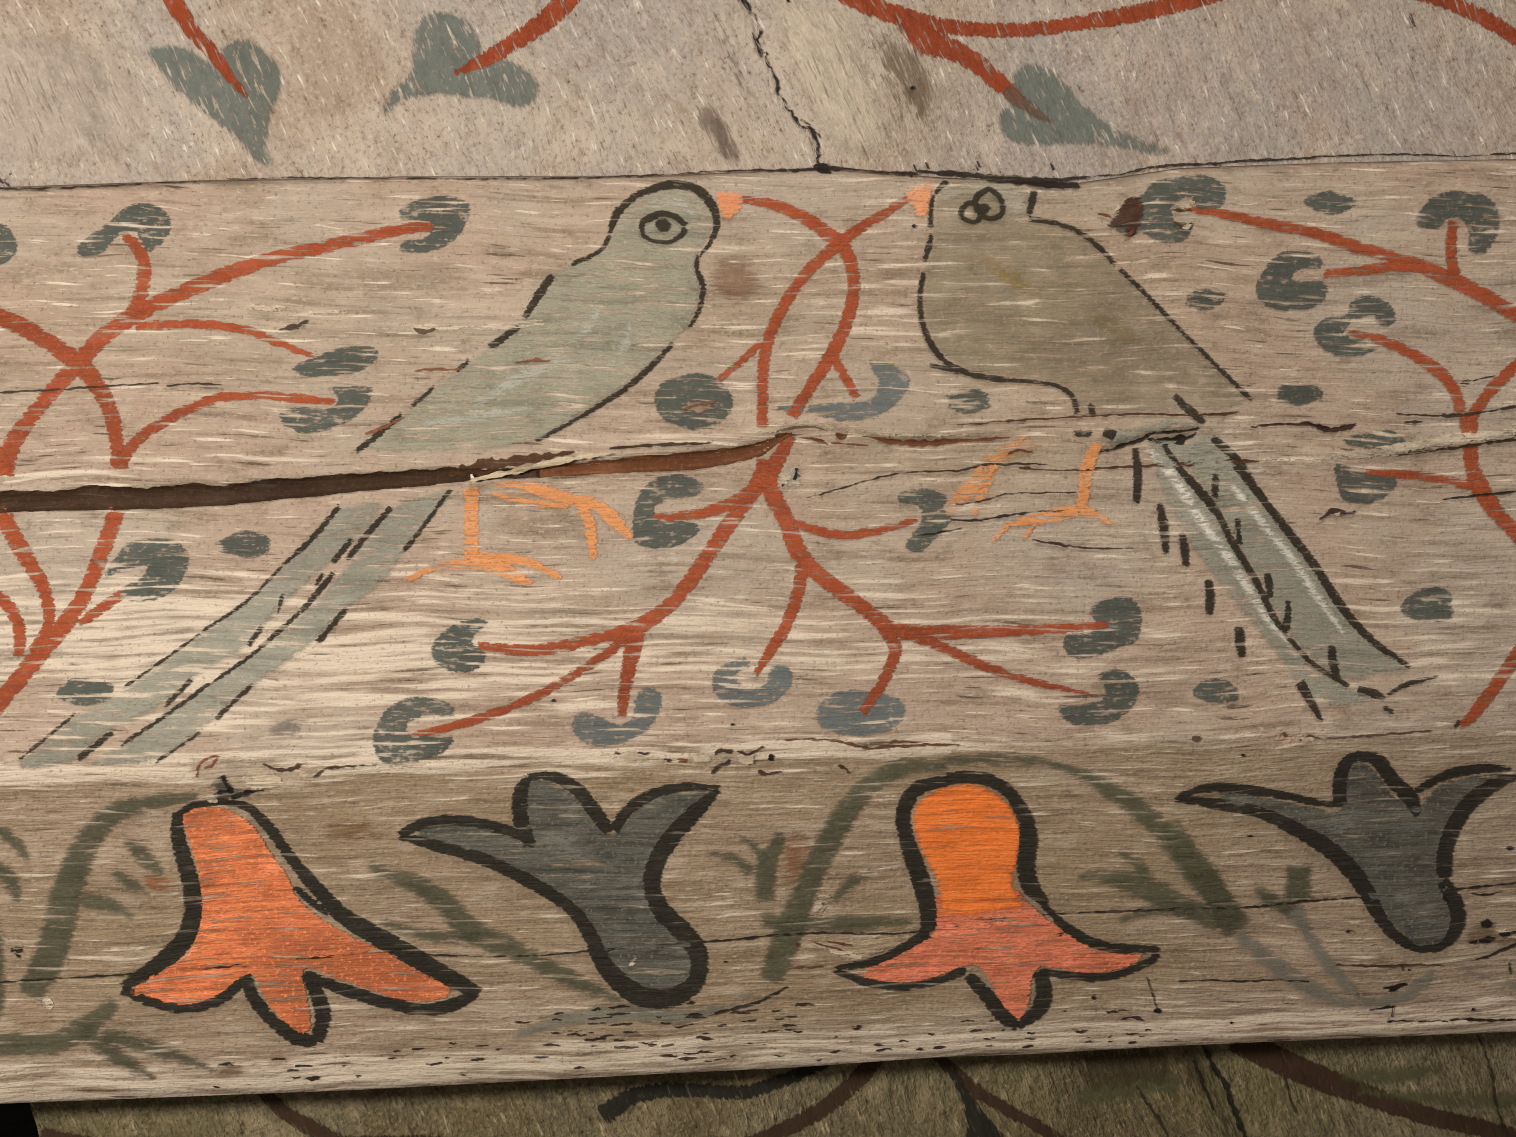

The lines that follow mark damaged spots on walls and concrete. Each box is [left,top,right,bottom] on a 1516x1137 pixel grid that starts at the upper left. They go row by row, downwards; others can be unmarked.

crack [741,0,821,163]
crack [515,356,550,364]
crack [415,366,460,374]
crack [0,382,221,394]
crack [957,411,1238,425]
crack [365,417,404,435]
crack [1396,405,1516,456]
crack [1442,491,1516,500]
crack [807,459,1283,550]